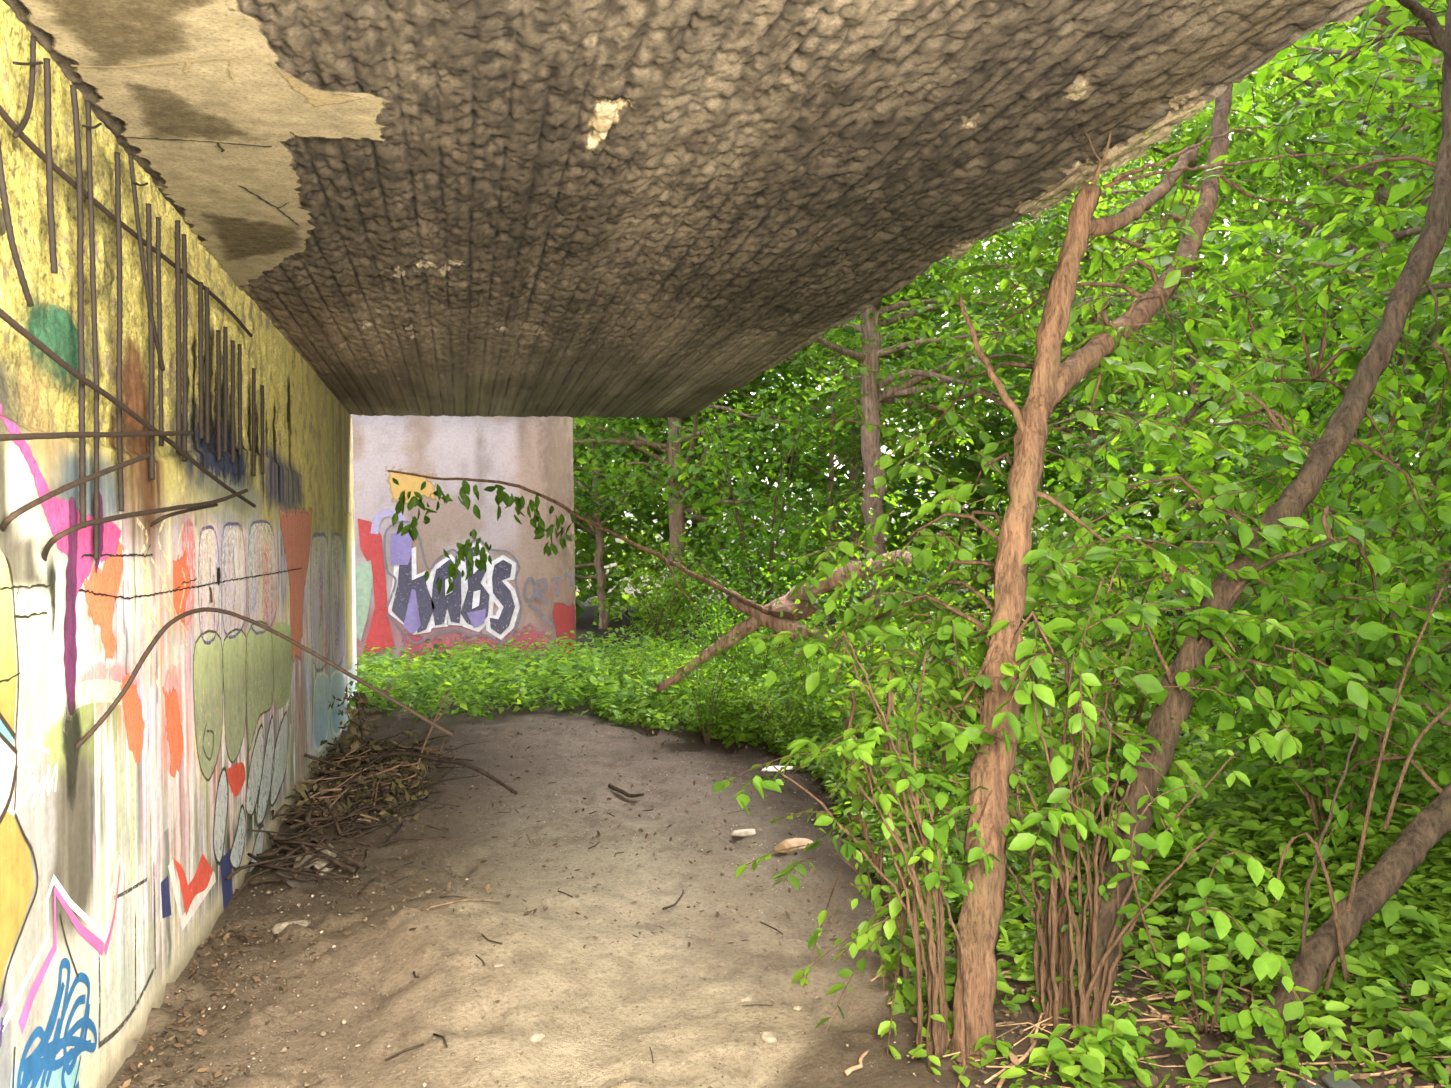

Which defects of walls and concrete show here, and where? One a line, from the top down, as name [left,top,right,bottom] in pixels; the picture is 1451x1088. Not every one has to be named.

spalling [586,97,633,151]
spalling [0,0,391,467]
crack [0,544,300,618]